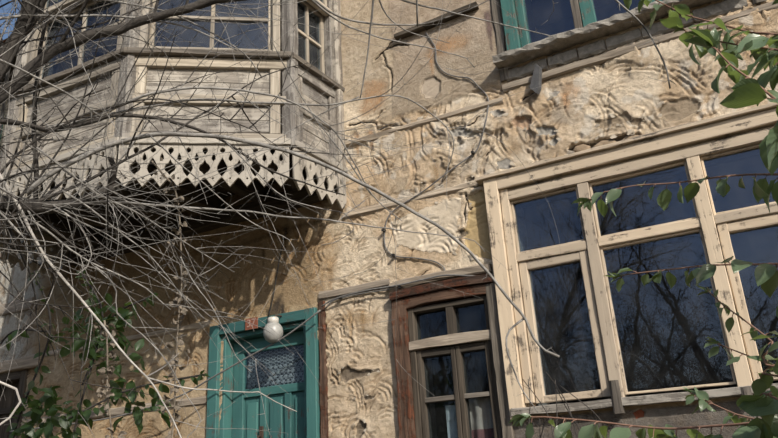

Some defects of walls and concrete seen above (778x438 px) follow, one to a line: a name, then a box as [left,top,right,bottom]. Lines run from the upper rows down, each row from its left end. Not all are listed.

crack [375,41,408,88]
peeling [490,109,562,146]
flaking render [568,111,647,153]
peeling [658,97,703,122]
flaking render [337,366,380,382]
flaking render [354,419,367,438]